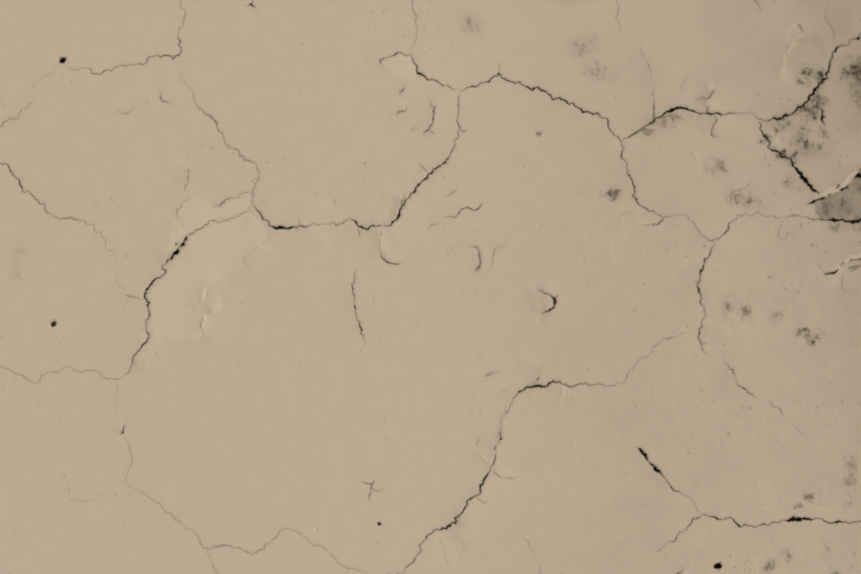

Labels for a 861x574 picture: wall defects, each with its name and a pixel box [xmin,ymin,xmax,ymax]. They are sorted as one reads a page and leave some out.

spalling [143,196,267,360]
crack [0,2,861,402]
spalling [813,171,861,220]
crack [77,427,358,574]
crack [404,325,688,570]
crack [638,448,861,552]